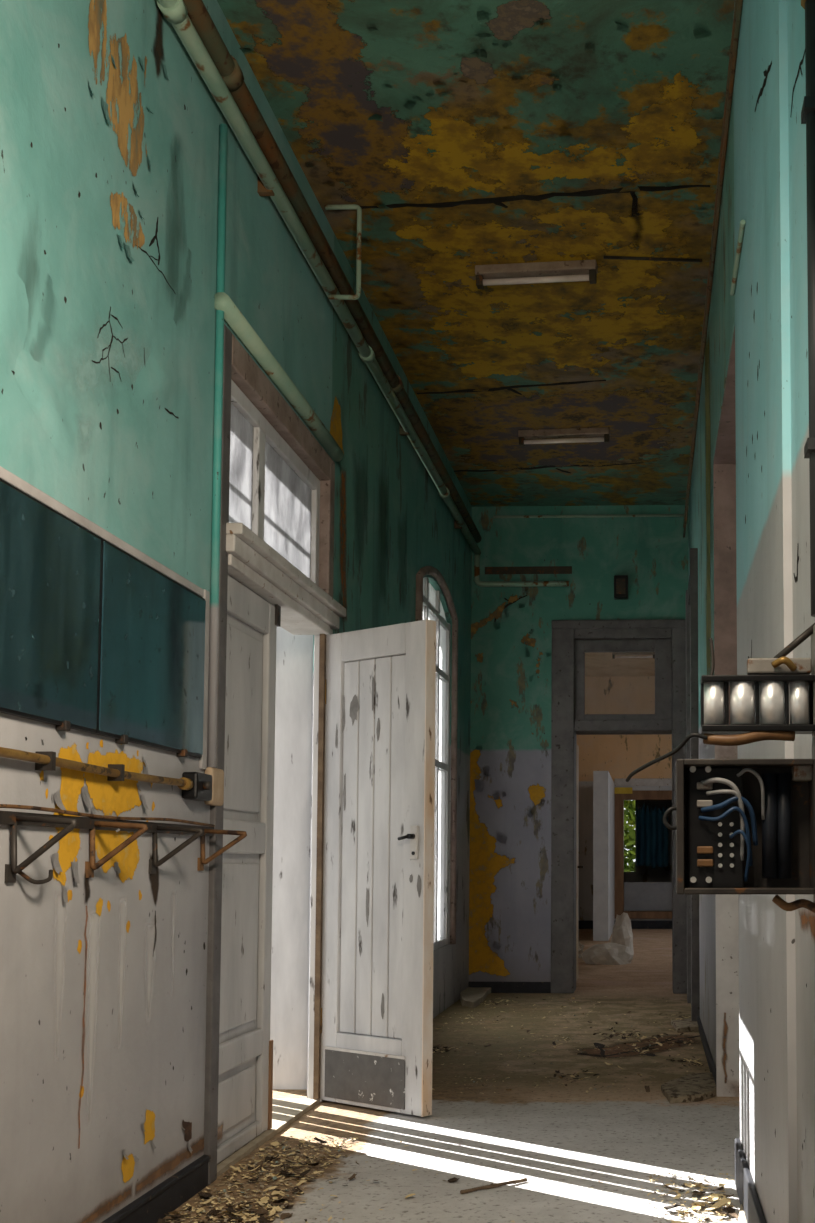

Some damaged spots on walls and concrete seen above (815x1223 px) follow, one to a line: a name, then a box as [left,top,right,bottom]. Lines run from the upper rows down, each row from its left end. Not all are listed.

peeling [88,0,170,262]
peeling [239,0,722,214]
crack [360,185,710,215]
peeling [386,199,697,386]
peeling [330,397,351,619]
peeling [40,740,155,903]
peeling [96,898,111,916]
peeling [469,744,515,977]